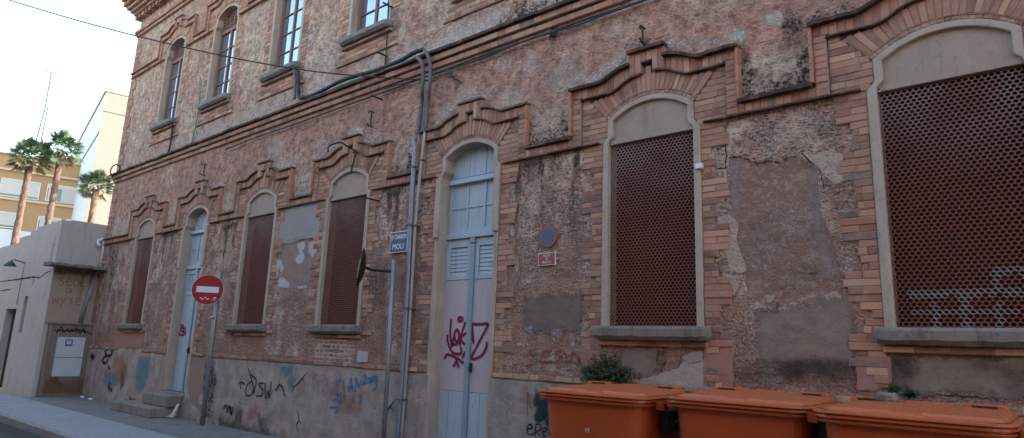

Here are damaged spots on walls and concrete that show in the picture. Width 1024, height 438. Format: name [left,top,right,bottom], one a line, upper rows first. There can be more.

mould [739,51,810,103]
flaking render [729,156,842,310]
peeling [276,239,318,290]